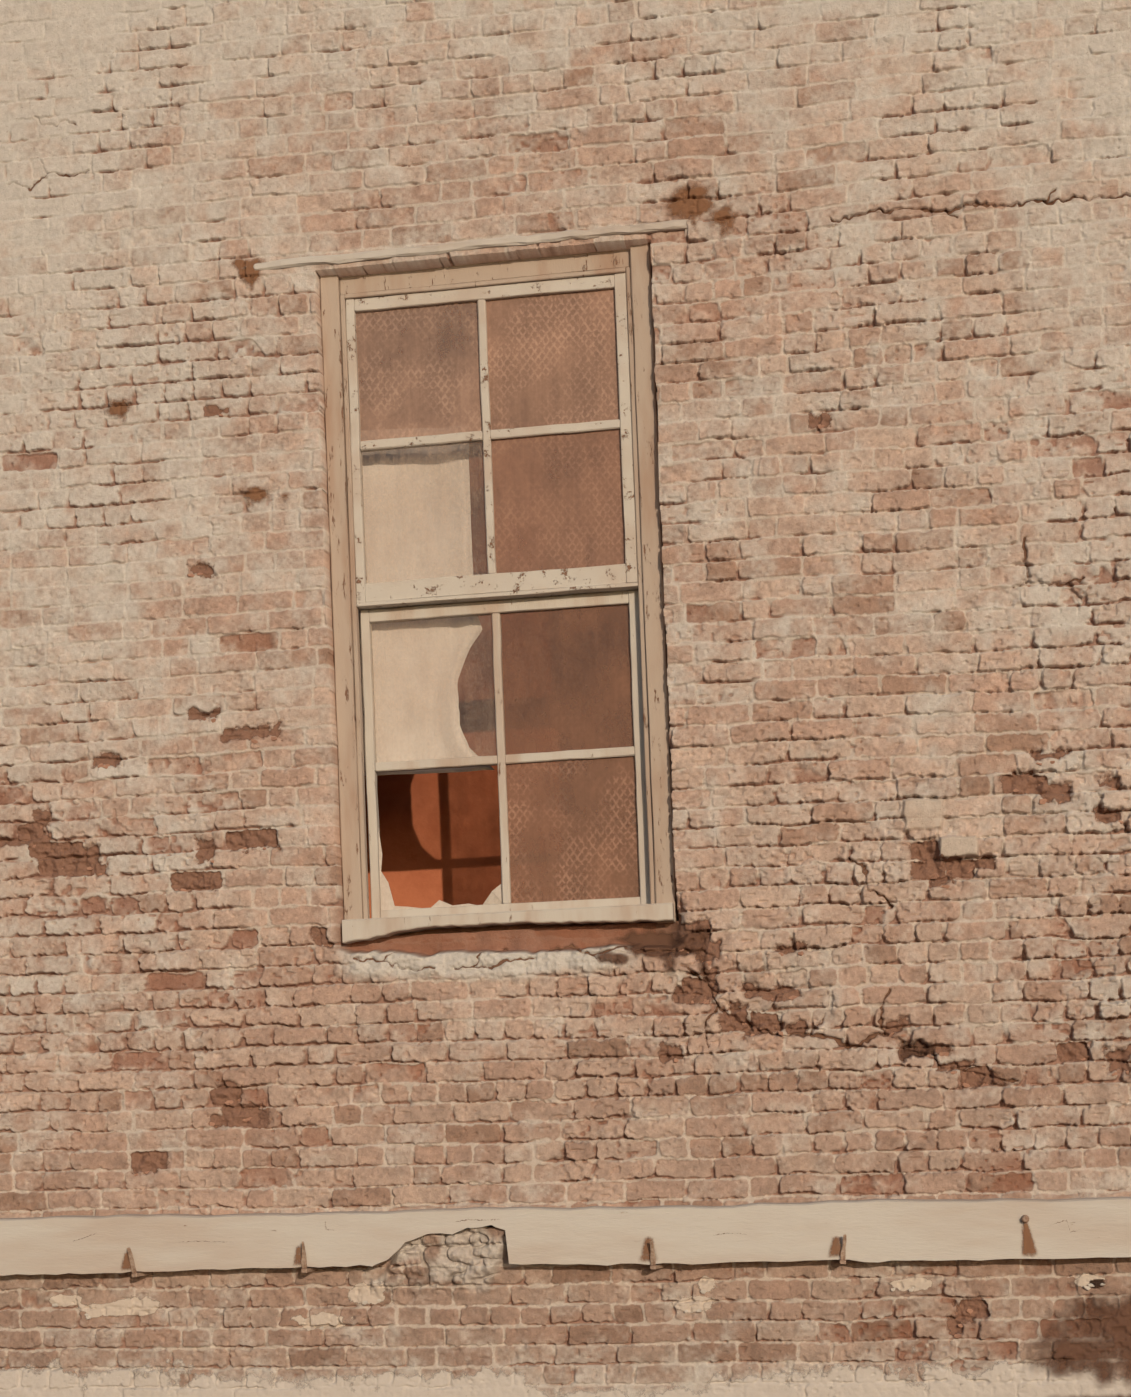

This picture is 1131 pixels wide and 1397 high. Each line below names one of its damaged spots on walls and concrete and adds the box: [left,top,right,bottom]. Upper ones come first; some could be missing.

rust [668,185,736,233]
spalling [1000,748,1071,804]
spalling [1099,776,1120,790]
spalling [1093,806,1124,824]
spalling [909,838,995,889]
crack [685,966,962,1070]